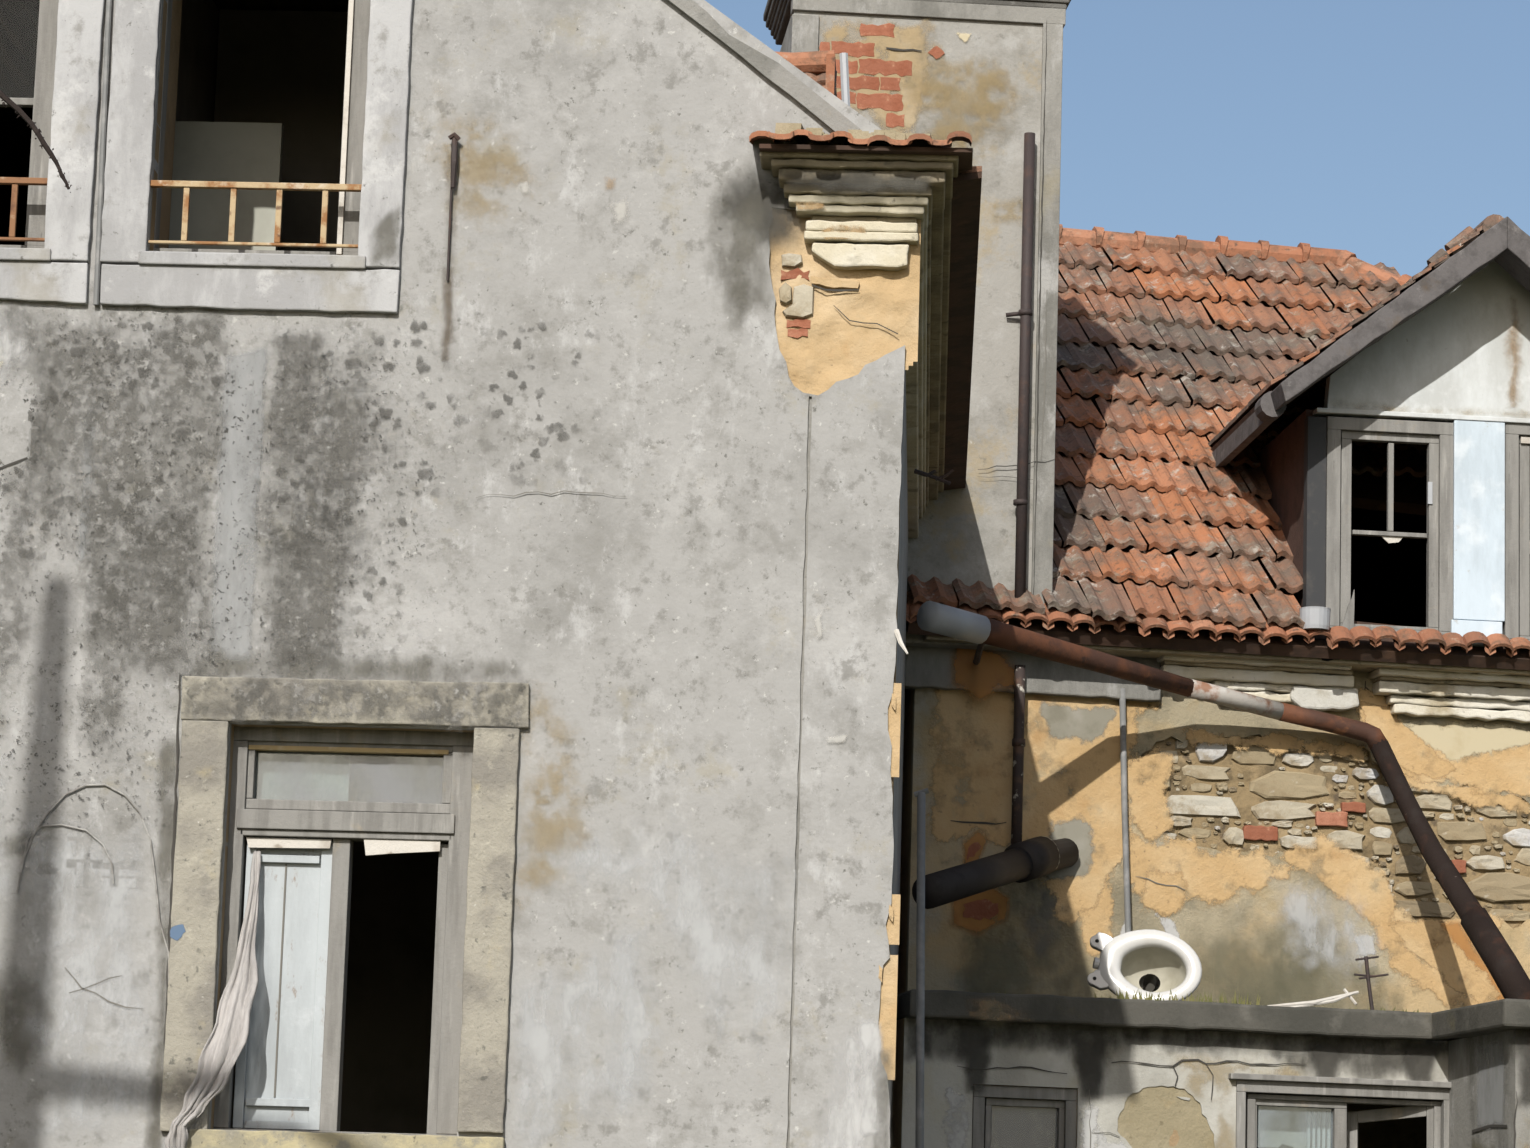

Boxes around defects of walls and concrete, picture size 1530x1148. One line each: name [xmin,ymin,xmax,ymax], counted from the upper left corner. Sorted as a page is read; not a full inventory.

flaking render [819,23,935,133]
water stain [723,201,760,308]
flaking render [769,203,921,395]
water stain [0,304,523,737]
spalling [888,683,901,777]
flaking render [928,689,1500,1007]
flaking render [1356,688,1530,929]
water stain [1076,1042,1102,1097]
flaking render [1080,1086,1215,1148]
water stain [1311,1041,1340,1077]
water stain [1404,1045,1437,1081]
water stain [1522,1043,1530,1103]